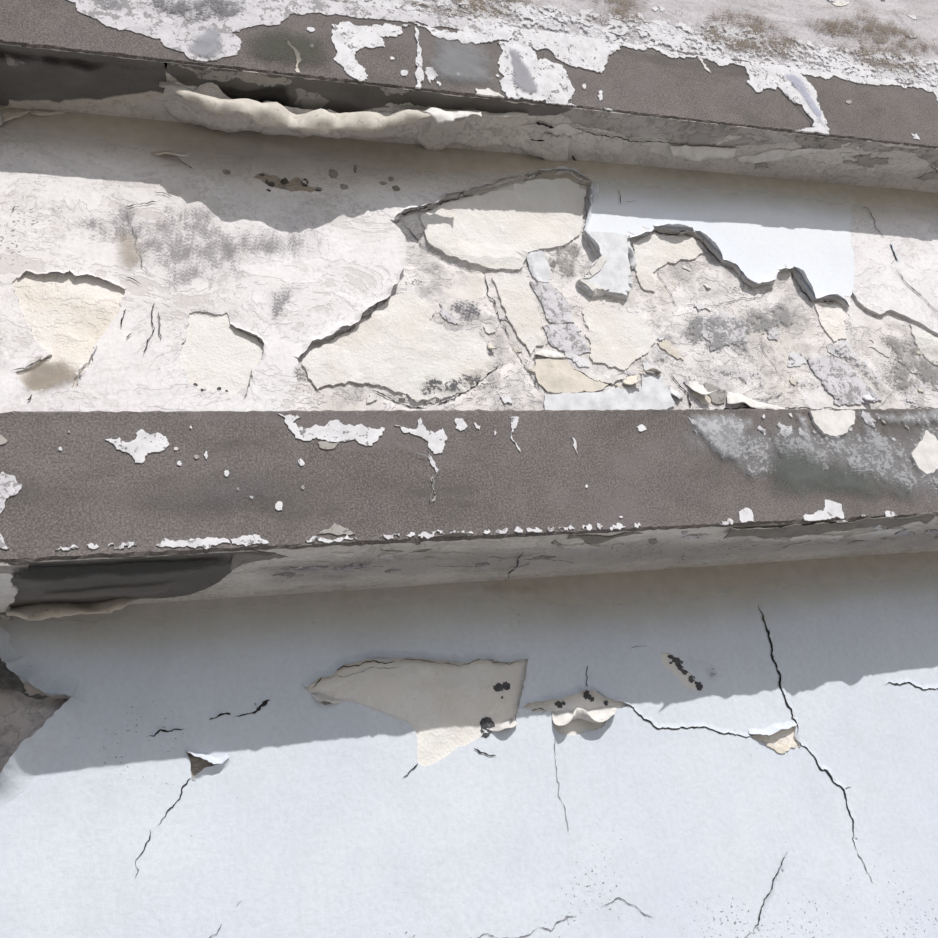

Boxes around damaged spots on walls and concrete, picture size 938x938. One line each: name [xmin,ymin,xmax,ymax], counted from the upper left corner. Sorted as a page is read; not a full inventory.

damp [328,0,938,86]
peeling [0,0,938,502]
peeling [0,472,22,514]
peeling [718,499,938,550]
spalling [0,516,657,806]
crack [623,696,762,738]
crack [758,605,872,881]
crack [881,677,938,690]
crack [135,778,191,878]
crack [746,850,792,938]